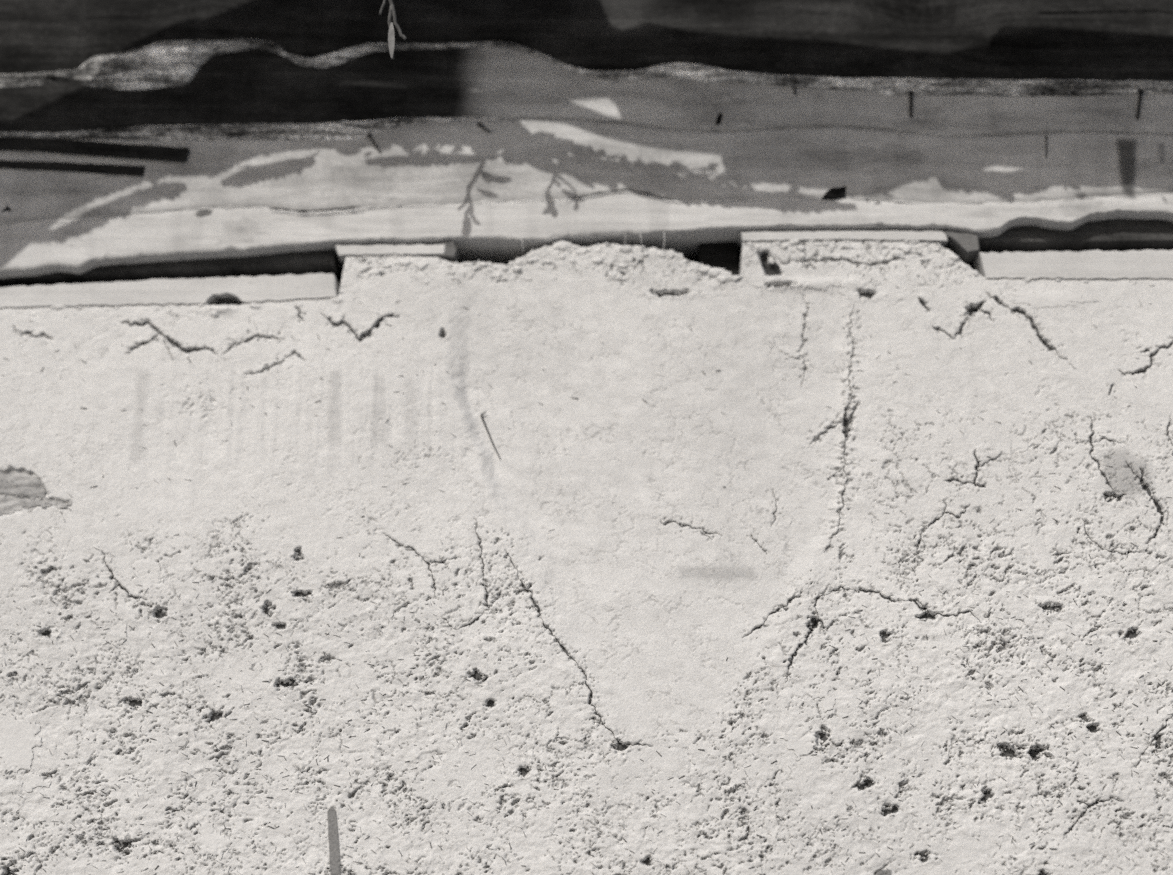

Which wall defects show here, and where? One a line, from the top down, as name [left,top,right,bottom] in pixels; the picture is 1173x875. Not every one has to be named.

spalling [434,241,458,263]
spalling [760,252,784,287]
crack [122,305,400,374]
crack [918,293,1068,360]
crack [1109,342,1173,395]
crack [809,306,858,552]
crack [917,449,1003,550]
crack [1052,417,1164,556]
crack [386,518,649,747]
crack [742,586,982,683]